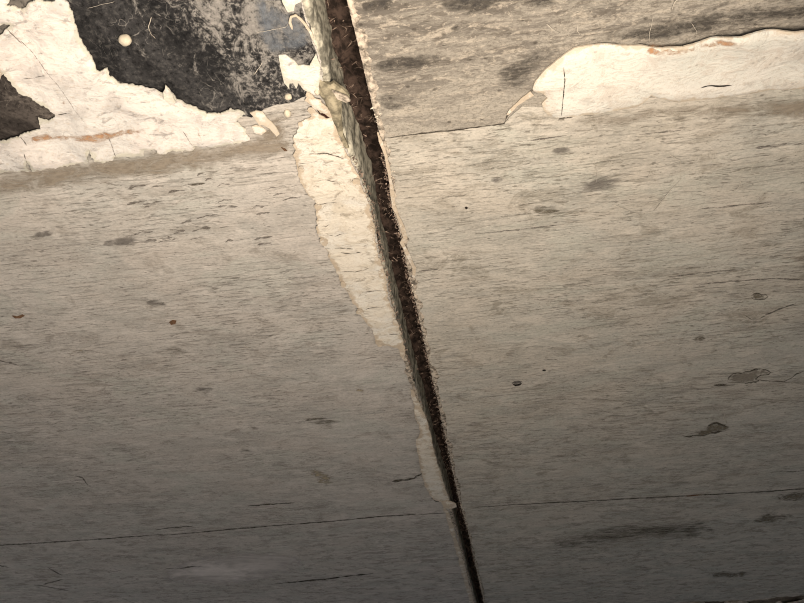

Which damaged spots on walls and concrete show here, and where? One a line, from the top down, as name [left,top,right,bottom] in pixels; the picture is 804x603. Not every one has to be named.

damp [362,0,390,9]
damp [444,0,500,12]
damp [624,7,804,54]
damp [380,57,426,68]
damp [500,57,538,84]
peeling [532,29,804,119]
peeling [0,0,485,603]